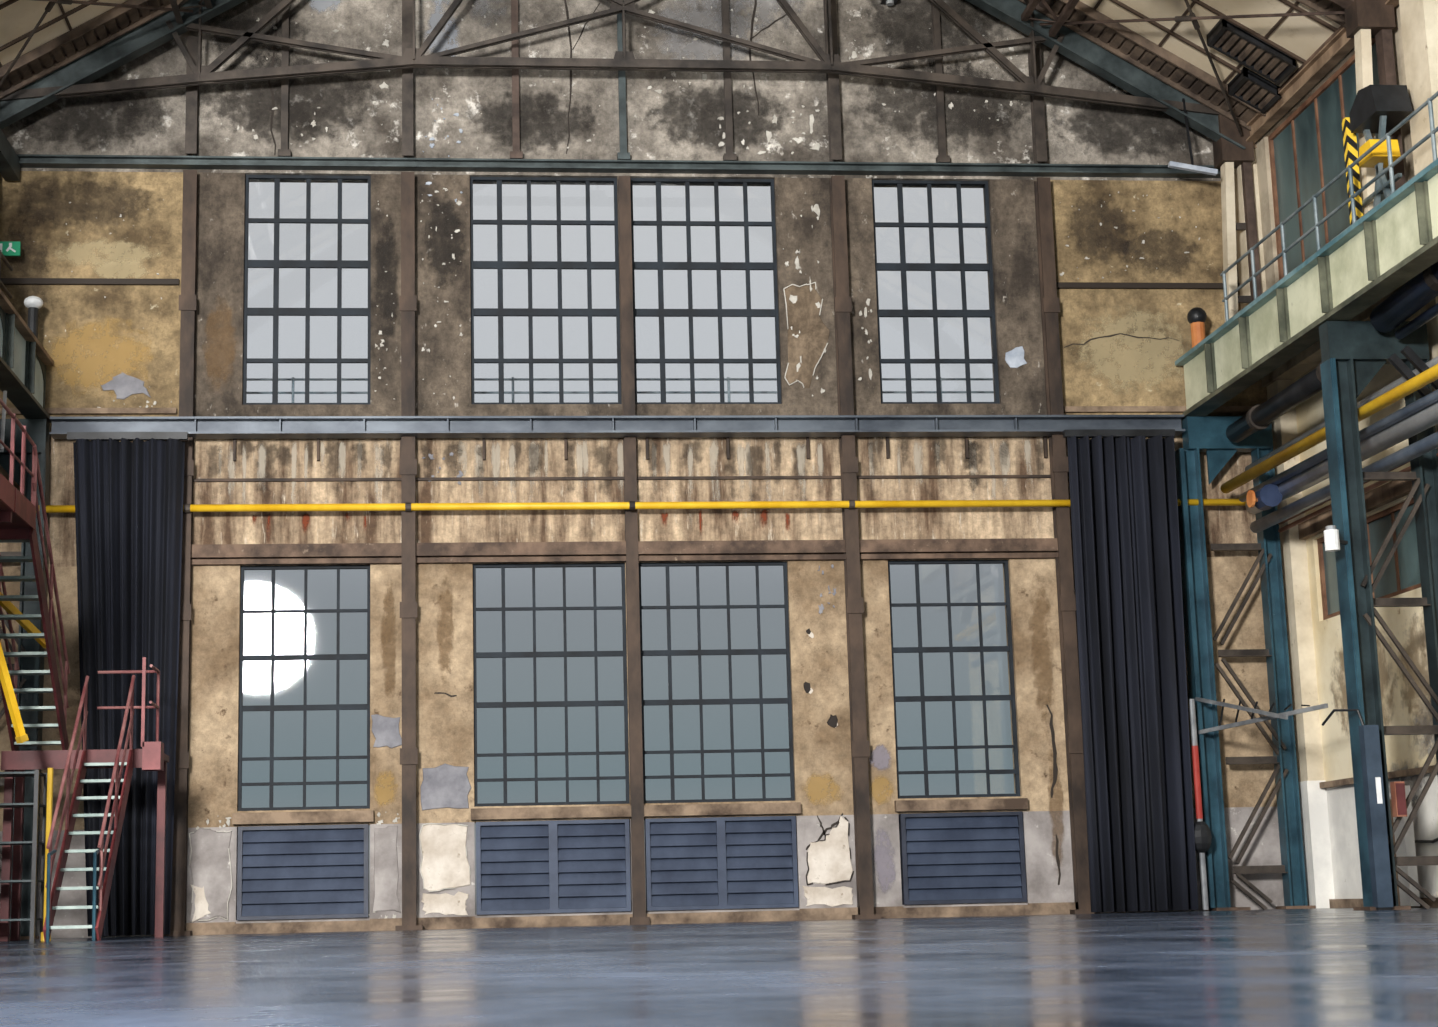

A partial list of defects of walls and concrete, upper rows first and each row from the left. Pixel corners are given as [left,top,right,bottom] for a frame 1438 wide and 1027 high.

spalling [1005,346,1027,368]
spalling [97,372,172,408]
water stain [219,446,265,500]
water stain [292,442,383,501]
water stain [458,442,548,488]
water stain [577,442,588,477]
water stain [737,444,769,480]
water stain [797,444,822,488]
water stain [969,441,1030,495]
spalling [419,764,471,916]
crack [806,813,843,850]
spalling [368,812,402,918]